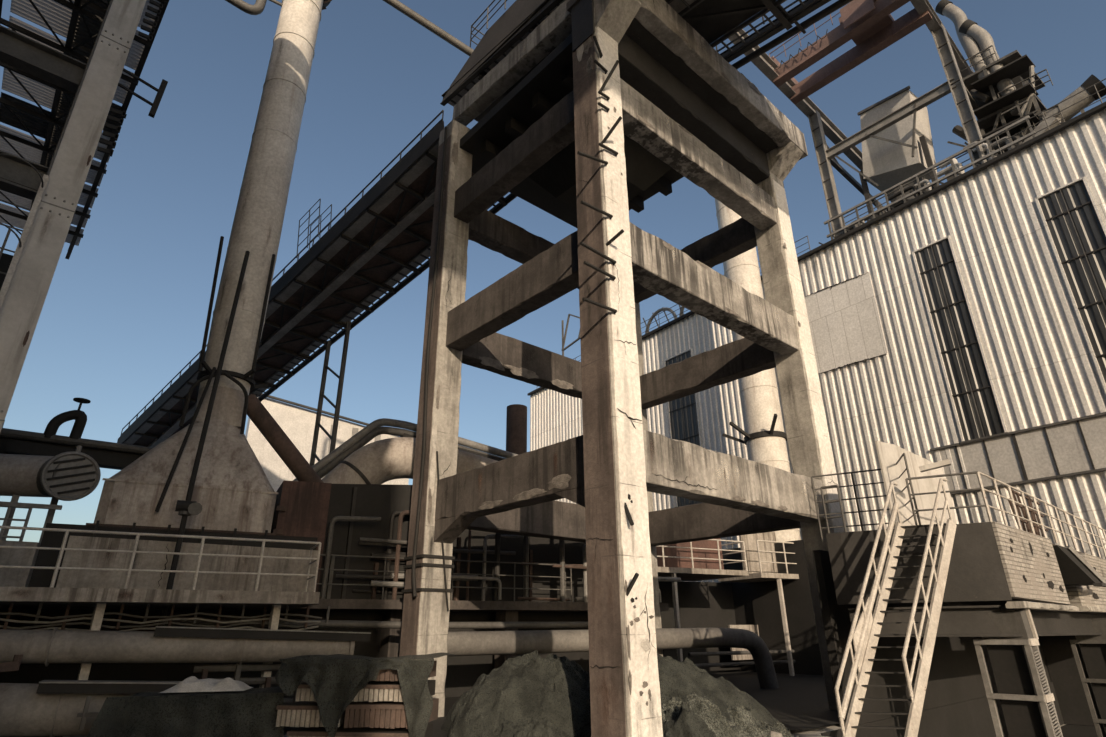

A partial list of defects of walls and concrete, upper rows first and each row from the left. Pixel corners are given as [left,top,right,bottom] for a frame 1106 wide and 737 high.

spalling [625,580,654,706]